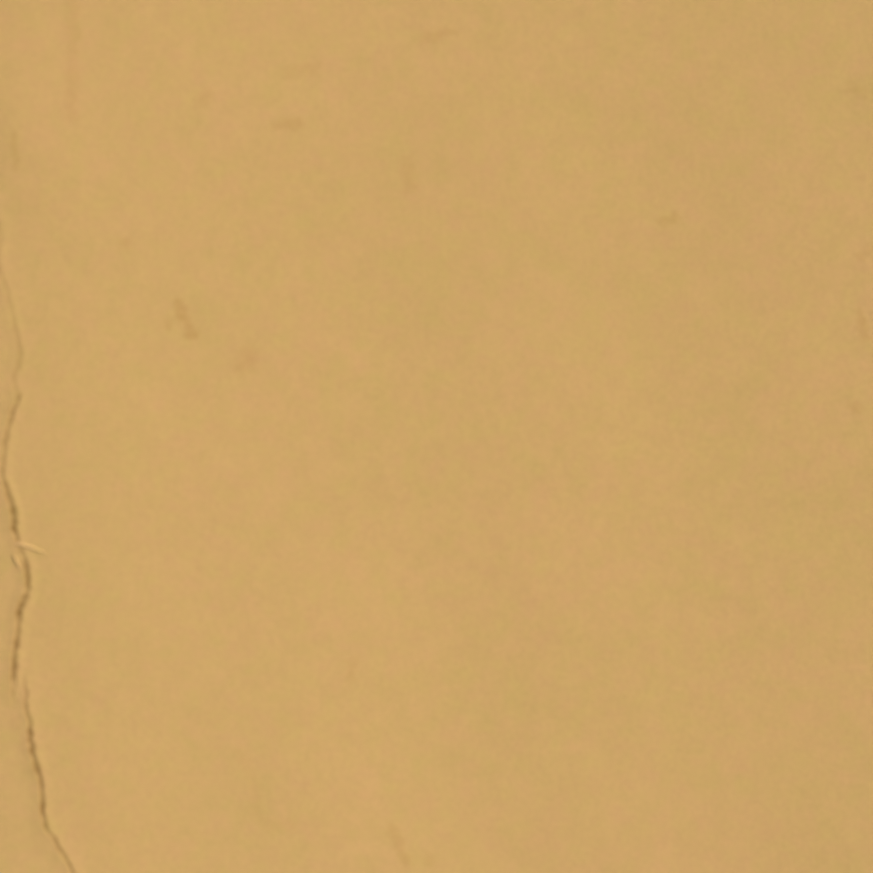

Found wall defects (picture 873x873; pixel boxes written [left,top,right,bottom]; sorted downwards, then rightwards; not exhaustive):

crack [0,178,91,873]